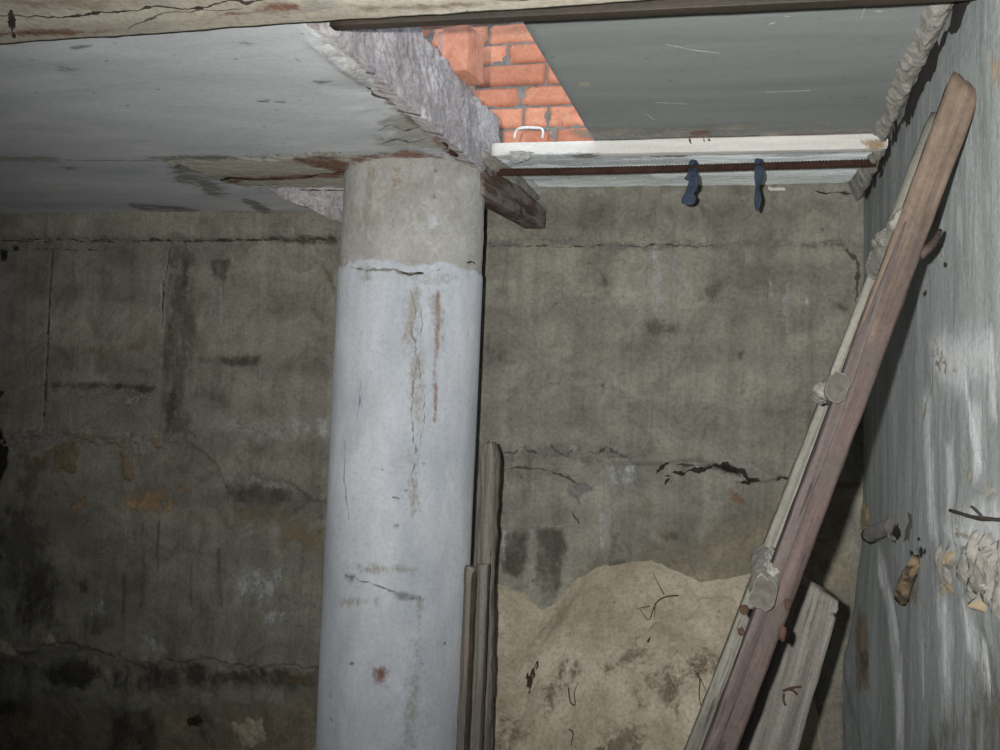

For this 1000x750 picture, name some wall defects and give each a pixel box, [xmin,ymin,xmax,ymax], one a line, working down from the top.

crack [0,0,262,29]
spalling [306,22,501,173]
corrosion [294,151,365,174]
crack [1,236,337,432]
crack [351,261,476,502]
crack [655,451,788,485]
water stain [502,530,565,589]
flaking render [939,504,1000,622]